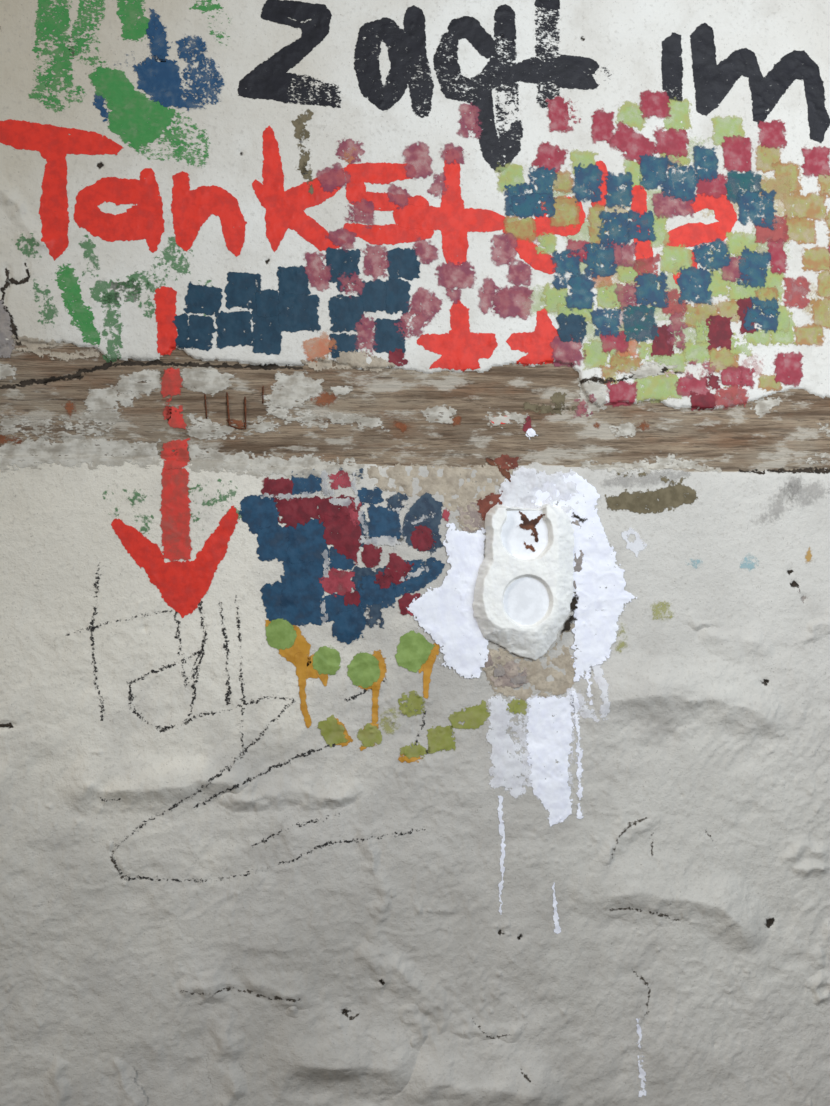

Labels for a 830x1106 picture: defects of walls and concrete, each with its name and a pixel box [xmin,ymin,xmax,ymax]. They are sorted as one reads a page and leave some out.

flaking render [0,300,100,383]
peeling [0,369,162,472]
flaking render [180,350,521,533]
flaking render [486,362,683,428]
peeling [609,422,637,438]
peeling [581,453,722,474]
peeling [749,396,782,418]